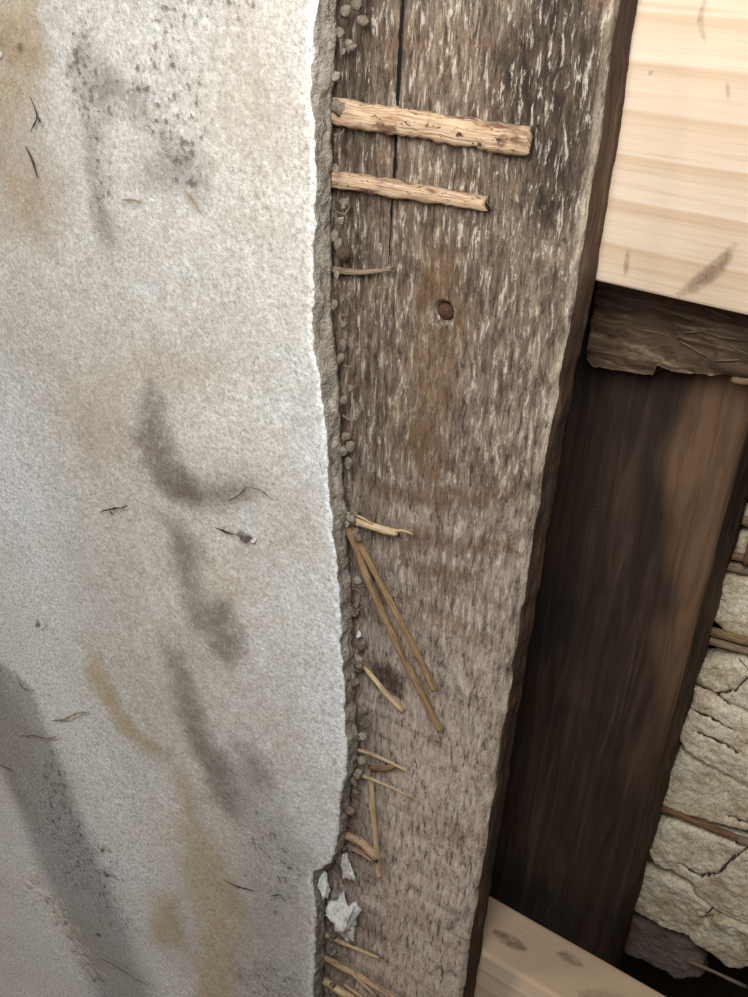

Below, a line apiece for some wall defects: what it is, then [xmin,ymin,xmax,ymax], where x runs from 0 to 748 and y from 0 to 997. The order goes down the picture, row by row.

spalling [337,0,370,56]
damp [59,10,112,213]
damp [121,0,212,186]
spalling [330,197,351,279]
spalling [331,296,355,368]
spalling [339,385,362,470]
spalling [351,630,376,689]
crack [694,657,748,753]
damp [38,749,147,950]
crack [682,816,748,878]